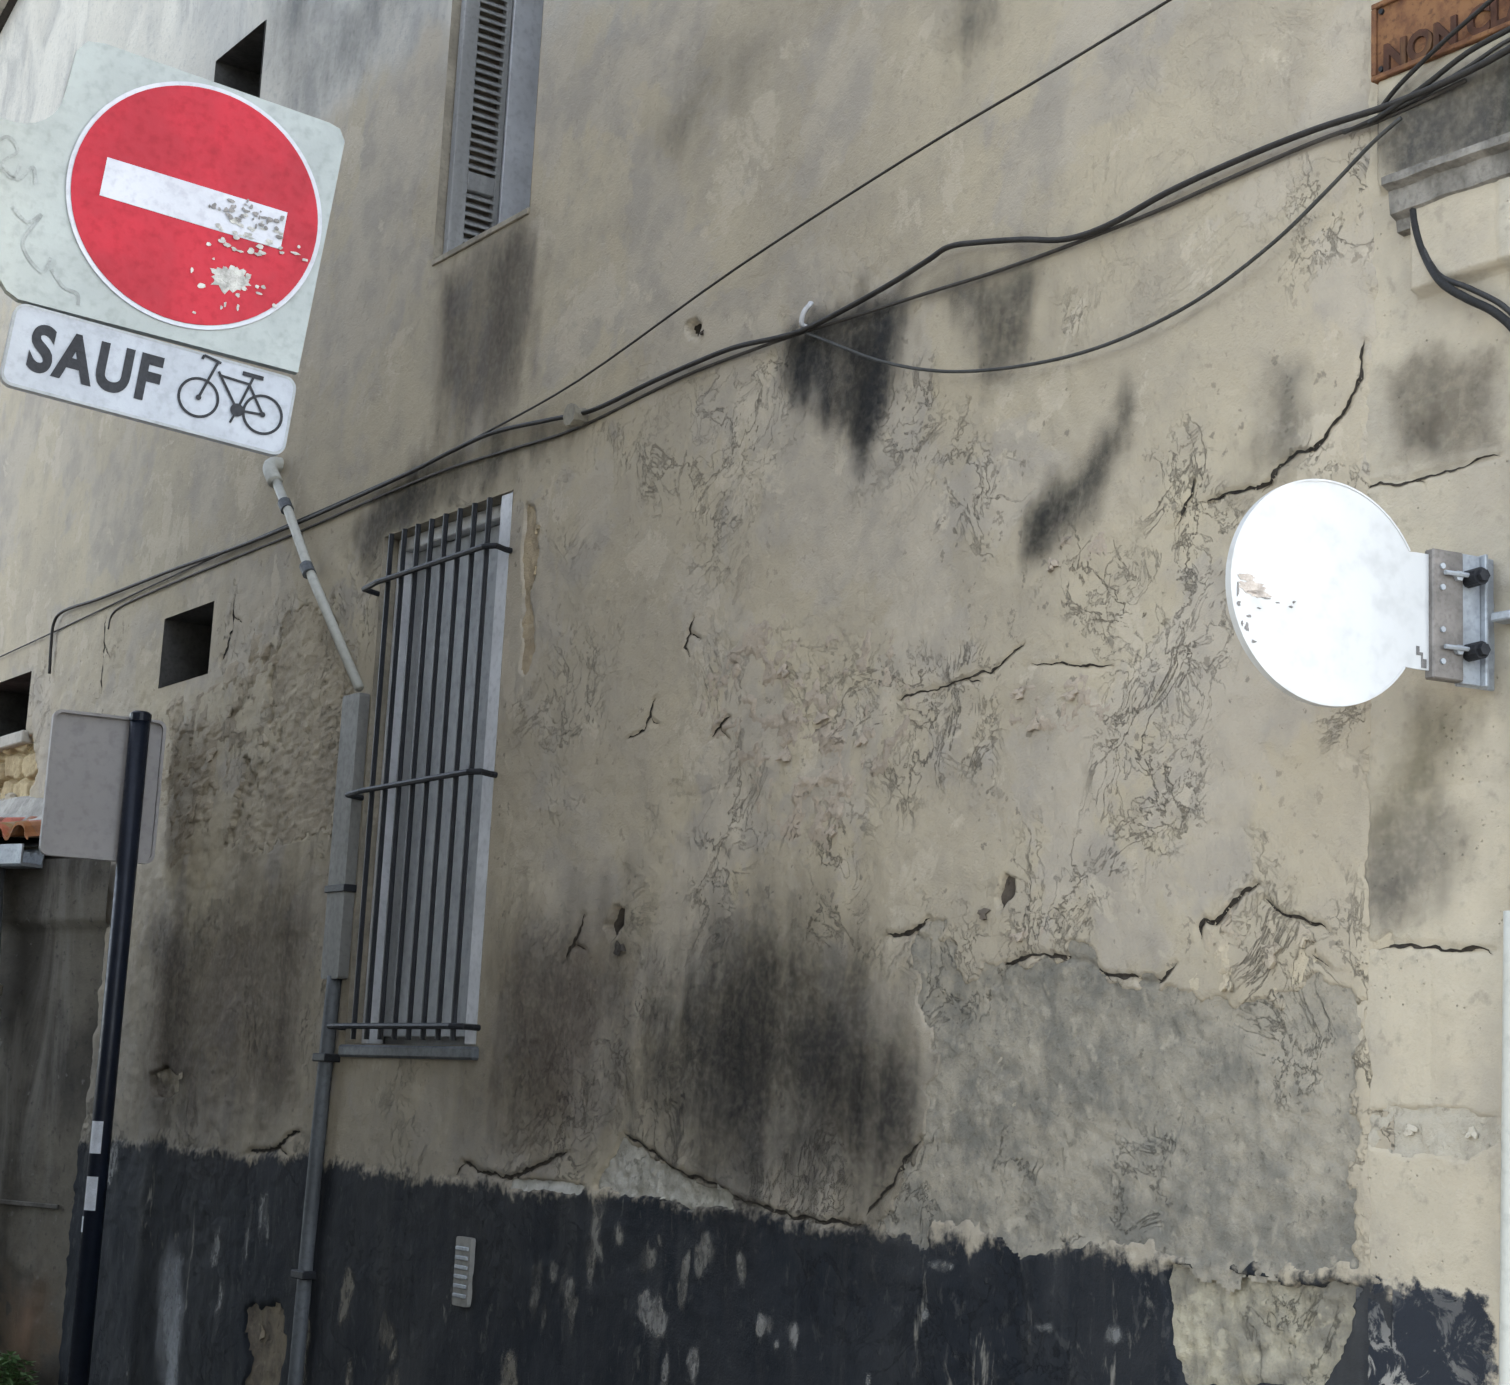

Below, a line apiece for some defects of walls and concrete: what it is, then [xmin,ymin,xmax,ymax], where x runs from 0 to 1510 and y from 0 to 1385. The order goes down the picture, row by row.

leakage [787,303,897,452]
crack [1176,340,1365,526]
leakage [1030,443,1110,551]
spalling [0,738,38,799]
spalling [231,597,357,853]
crack [901,645,1114,700]
crack [1006,883,1329,983]
spalling [511,1137,734,1210]
crack [624,1133,921,1228]
spalling [878,900,1501,1385]
peeling [531,1207,623,1319]
peeling [245,1302,287,1385]